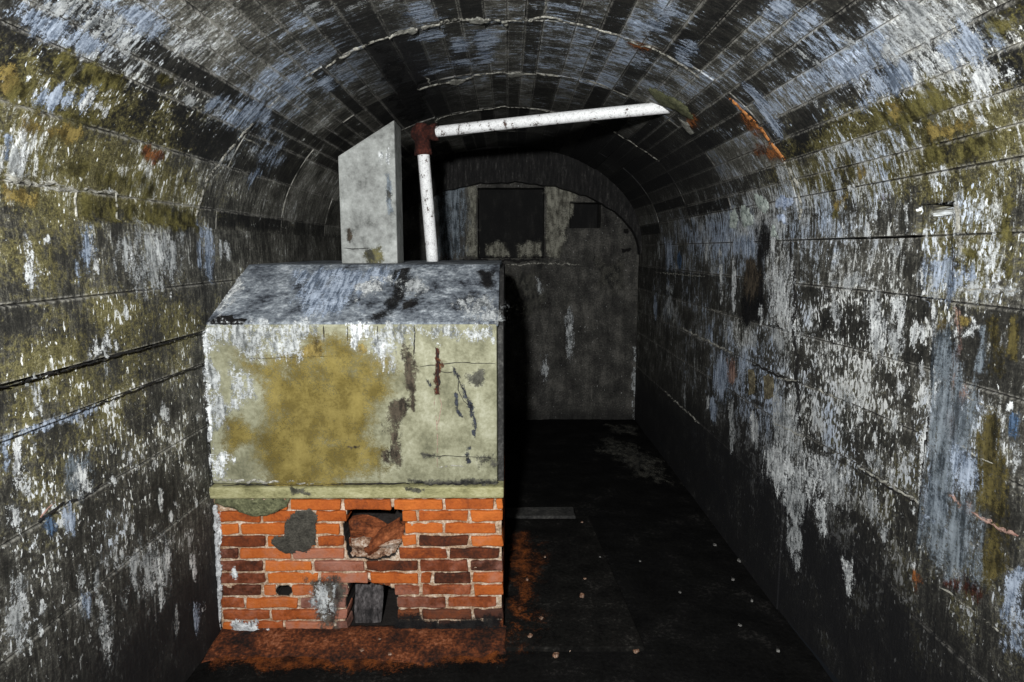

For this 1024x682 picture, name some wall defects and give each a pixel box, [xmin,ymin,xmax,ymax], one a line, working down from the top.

crack [326,2,700,78]
damp [33,82,108,117]
crack [418,72,558,90]
crack [435,106,555,123]
damp [74,226,100,283]
damp [114,218,230,298]
damp [195,185,577,513]
damp [704,215,801,454]
corrosion [433,343,444,450]
damp [749,386,851,570]
spalling [349,514,406,556]
damp [841,556,856,597]